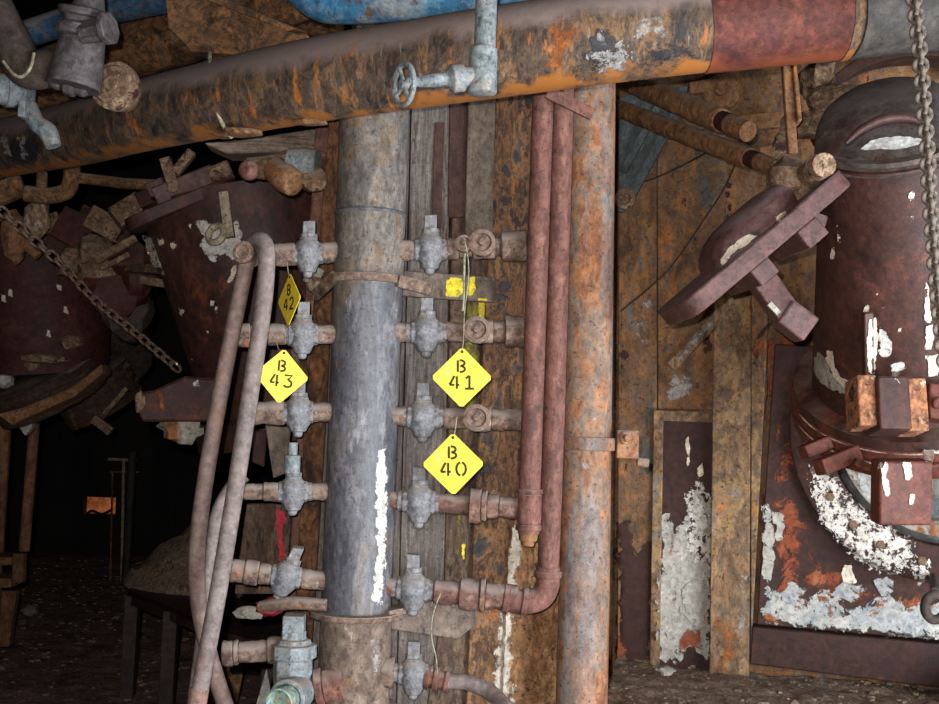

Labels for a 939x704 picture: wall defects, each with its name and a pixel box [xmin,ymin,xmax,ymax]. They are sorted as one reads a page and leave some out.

peeling [922,450,939,462]
damp [507,525,522,585]
peeling [610,436,720,704]
peeling [760,462,939,640]
damp [492,612,517,703]
peeling [728,671,825,704]
peeling [834,680,939,704]